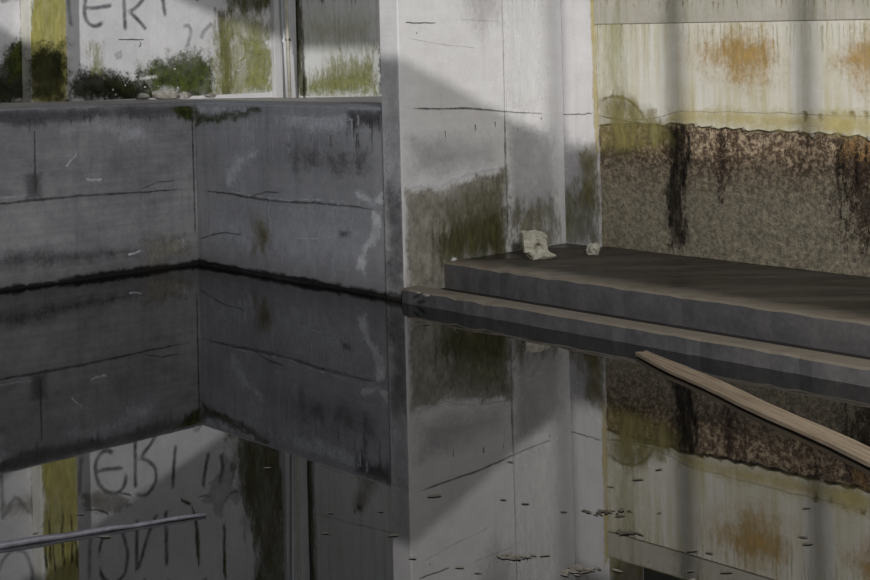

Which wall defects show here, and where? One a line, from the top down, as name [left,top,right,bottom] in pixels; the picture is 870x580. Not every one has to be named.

water stain [217,11,233,94]
crack [0,119,367,239]
water stain [209,95,701,289]